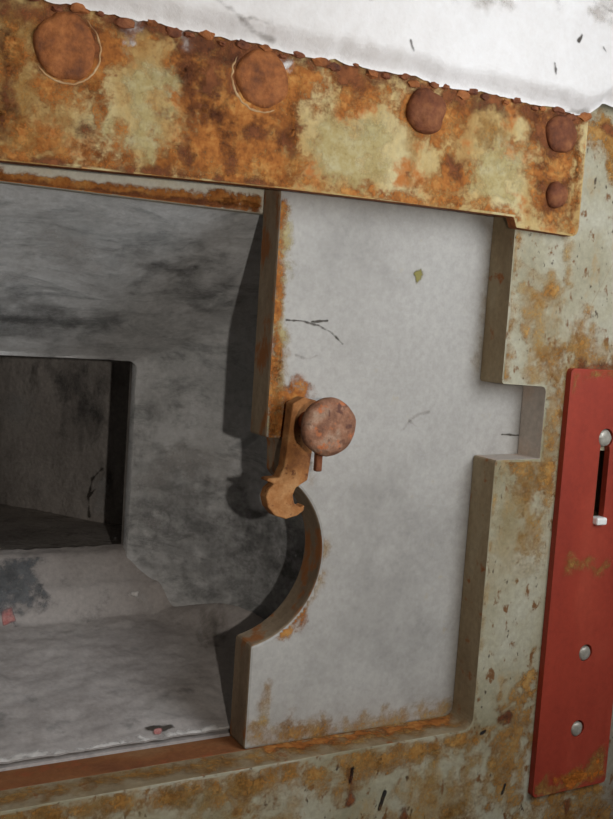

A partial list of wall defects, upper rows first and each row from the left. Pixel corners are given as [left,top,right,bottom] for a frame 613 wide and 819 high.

corrosion [0,1,613,234]
corrosion [274,375,311,437]
corrosion [508,271,613,549]
corrosion [279,601,308,639]
corrosion [0,668,611,819]